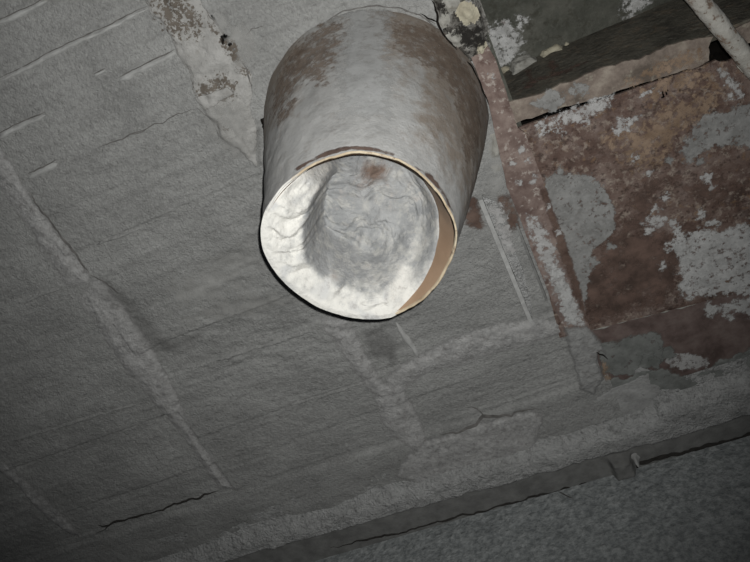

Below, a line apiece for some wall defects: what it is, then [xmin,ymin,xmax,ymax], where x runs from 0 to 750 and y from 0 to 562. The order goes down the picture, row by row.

peeling [146,0,264,167]
efflorescence [718,67,745,101]
corrosion [541,48,729,324]
crack [440,406,538,435]
crack [96,491,217,534]